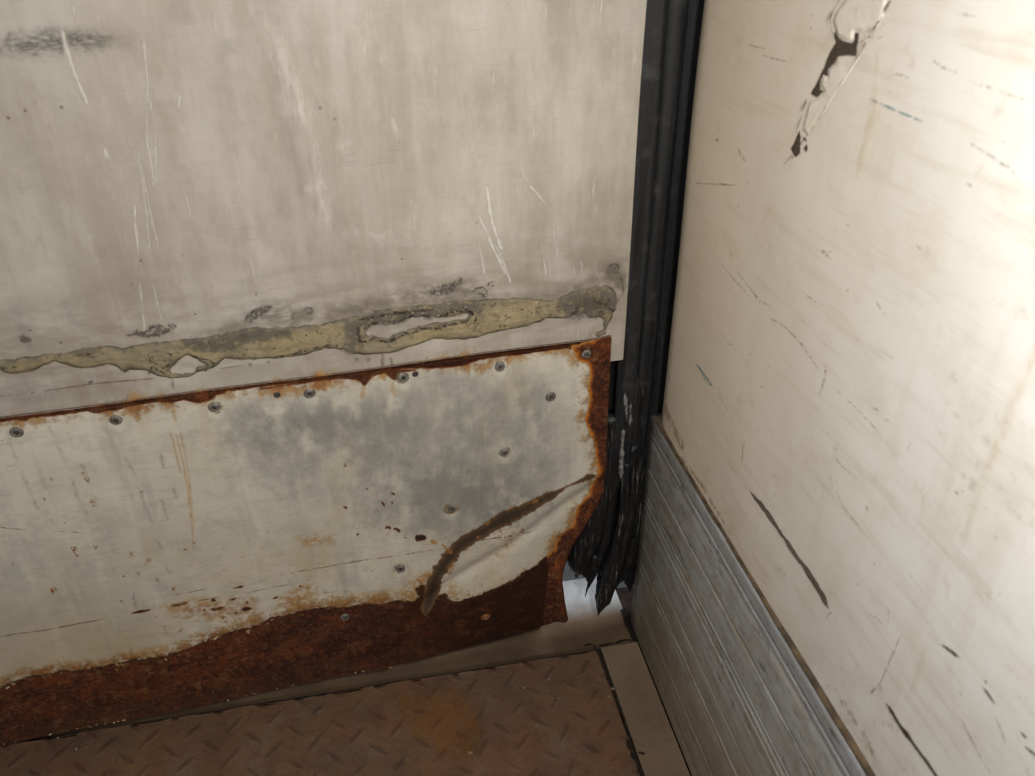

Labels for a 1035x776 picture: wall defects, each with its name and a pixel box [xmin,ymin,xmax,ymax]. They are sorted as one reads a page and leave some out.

peeling [784,0,891,164]
rust [0,336,612,745]